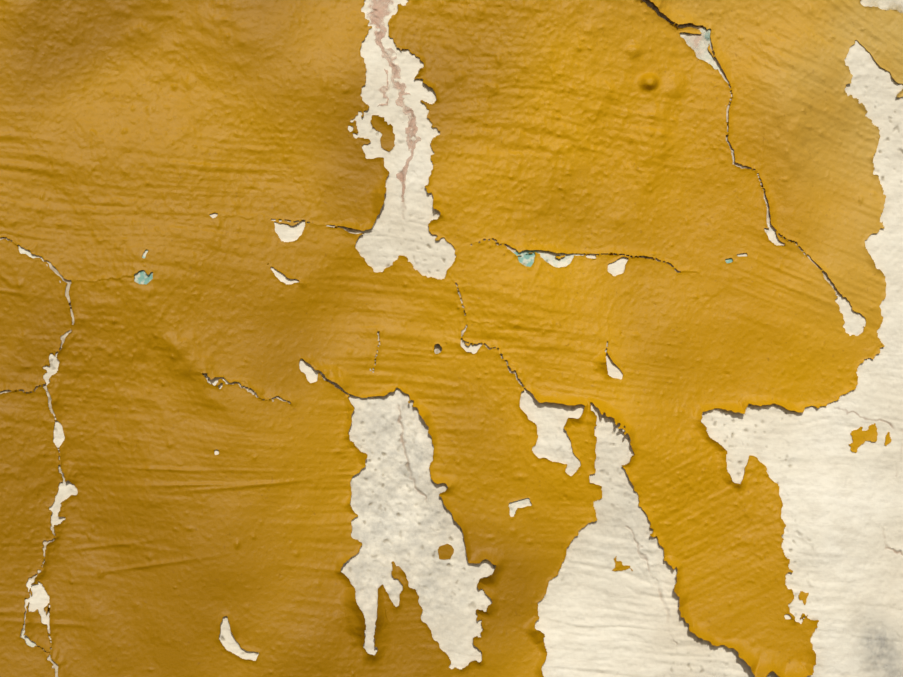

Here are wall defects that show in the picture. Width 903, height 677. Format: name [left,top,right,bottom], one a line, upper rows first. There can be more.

crack [0,227,132,421]
crack [198,369,297,409]
crack [219,214,360,238]
spalling [271,214,311,246]
crack [368,10,418,221]
peeling [345,0,460,284]
spalling [677,25,725,75]
peeling [512,35,903,677]
crack [633,0,846,298]
crack [15,444,80,677]
spalling [213,610,264,665]
peeling [326,375,514,676]